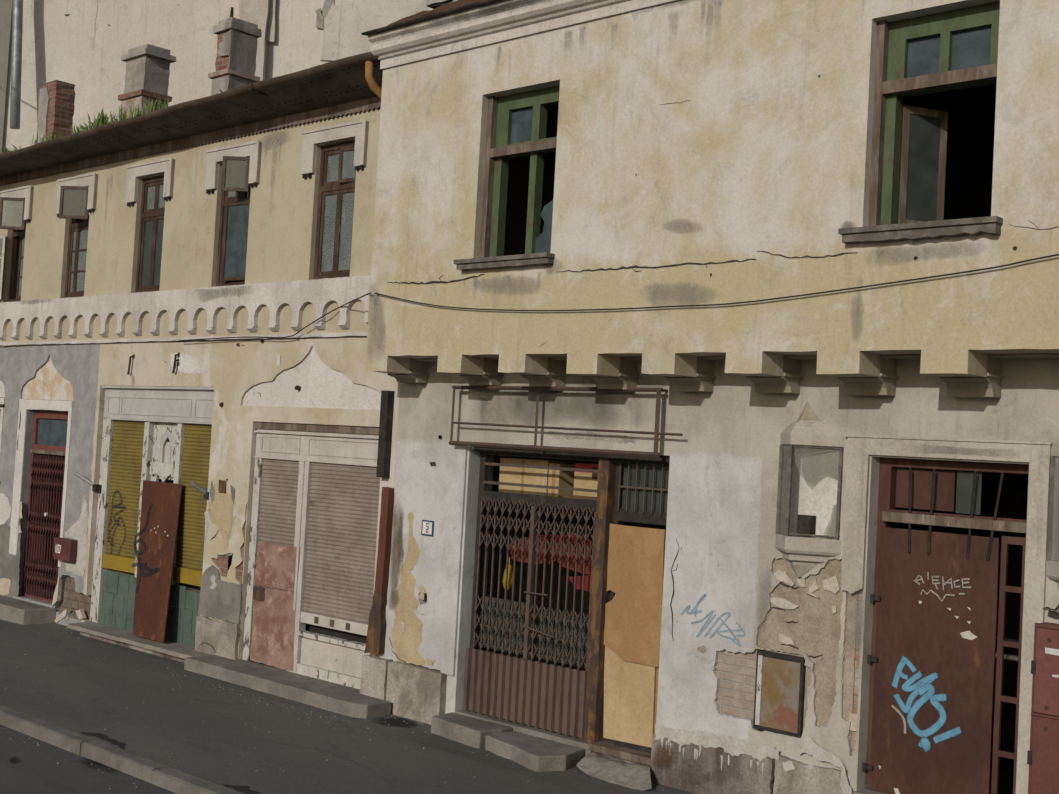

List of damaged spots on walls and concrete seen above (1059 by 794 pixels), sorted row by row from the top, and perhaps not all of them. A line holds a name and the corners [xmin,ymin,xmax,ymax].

crack [387,274,484,284]
crack [560,251,858,277]
peeling [204,481,246,589]
peeling [391,512,435,667]
flaking render [654,558,863,794]